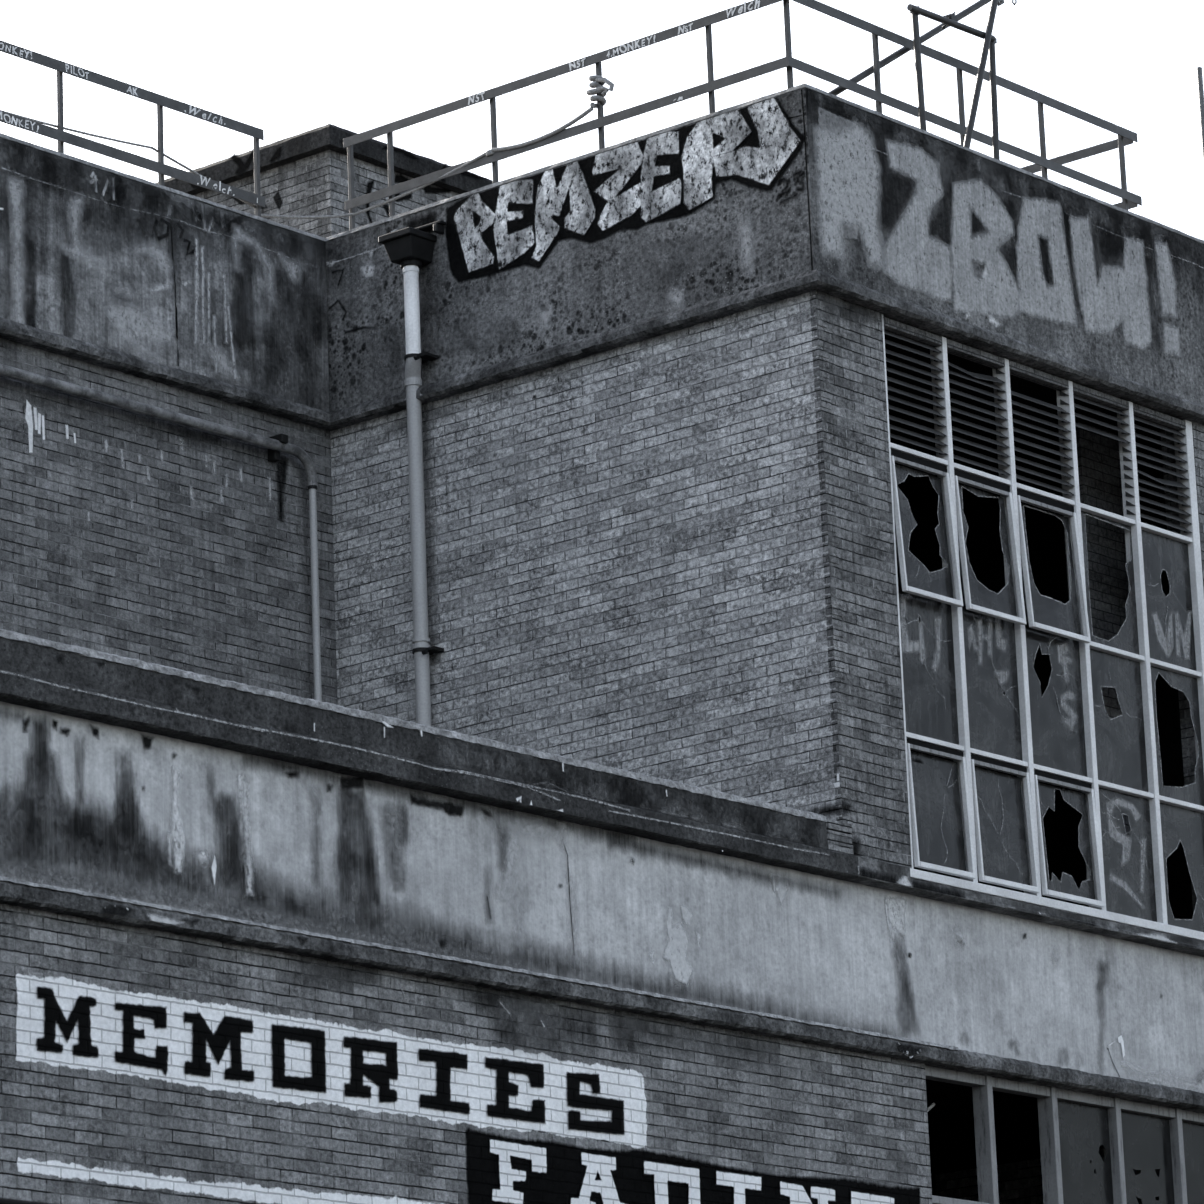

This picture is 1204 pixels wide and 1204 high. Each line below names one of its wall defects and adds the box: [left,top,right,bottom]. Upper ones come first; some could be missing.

water stain [0,144,321,408]
water stain [0,384,287,521]
water stain [0,722,850,1020]
flaking render [650,906,700,983]